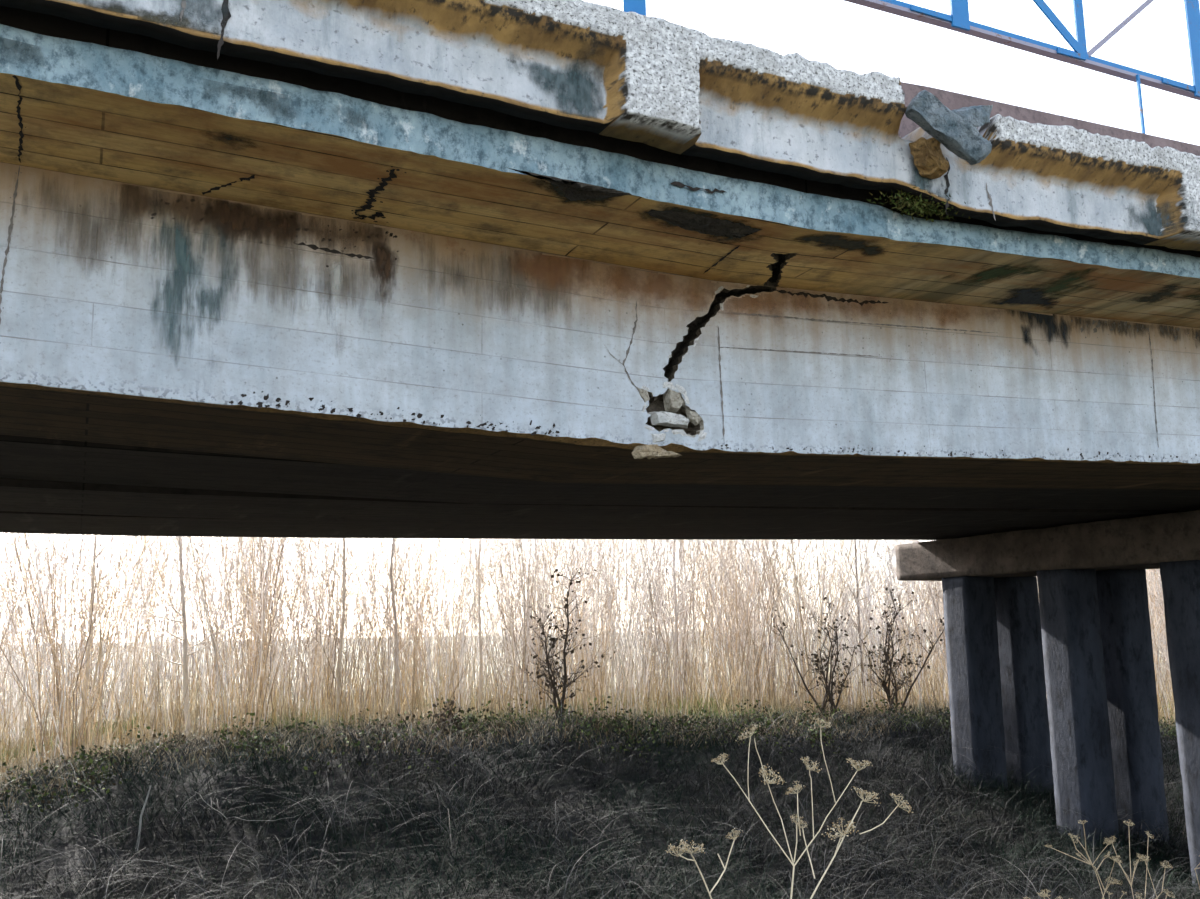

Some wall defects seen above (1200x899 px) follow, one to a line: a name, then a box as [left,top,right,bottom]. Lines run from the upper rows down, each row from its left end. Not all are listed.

crack [217,0,231,59]
water stain [529,58,603,118]
spalling [905,90,993,179]
crack [0,75,26,343]
crack [202,175,255,195]
crack [351,166,406,222]
water stain [70,184,386,344]
crack [294,242,374,259]
rust [372,244,395,296]
crack [606,301,638,390]
crack [663,245,994,444]
spalling [632,382,707,459]